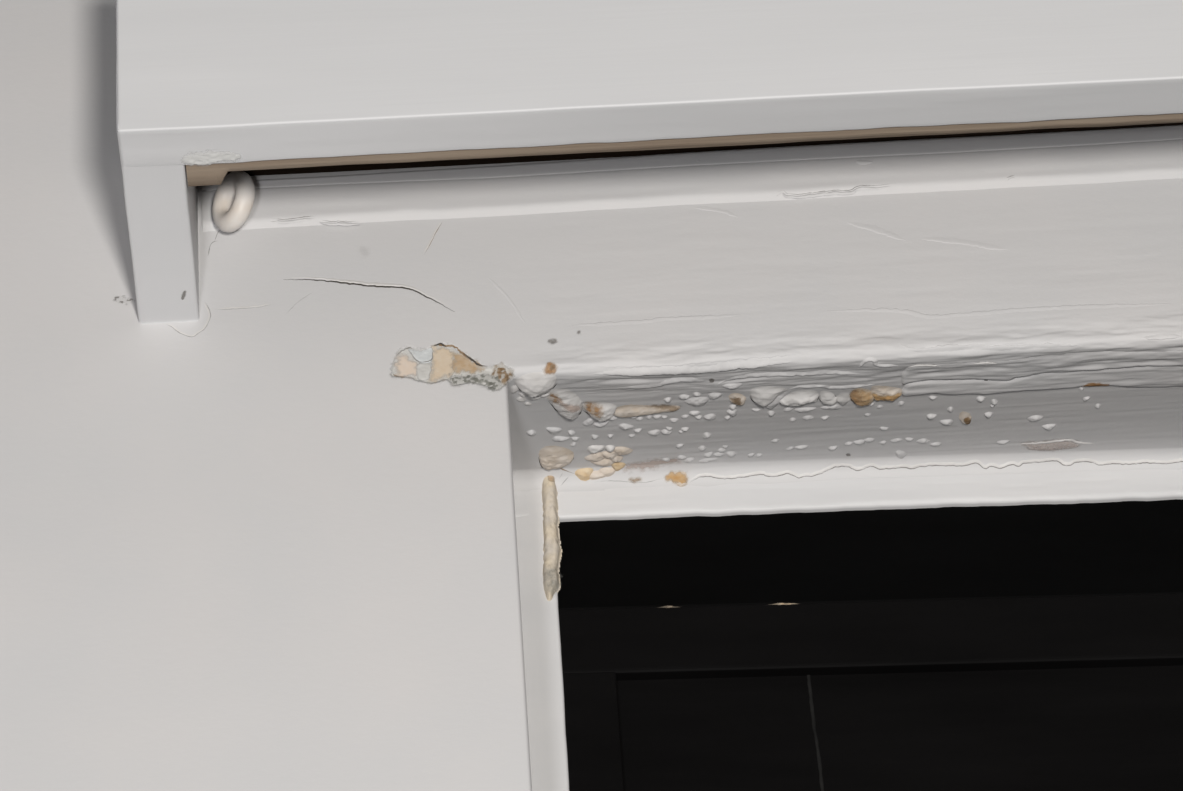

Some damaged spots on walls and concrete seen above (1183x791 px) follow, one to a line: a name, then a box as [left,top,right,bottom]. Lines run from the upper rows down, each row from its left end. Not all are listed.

crack [284,277,450,309]
peeling [391,343,514,391]
crack [690,457,1183,480]